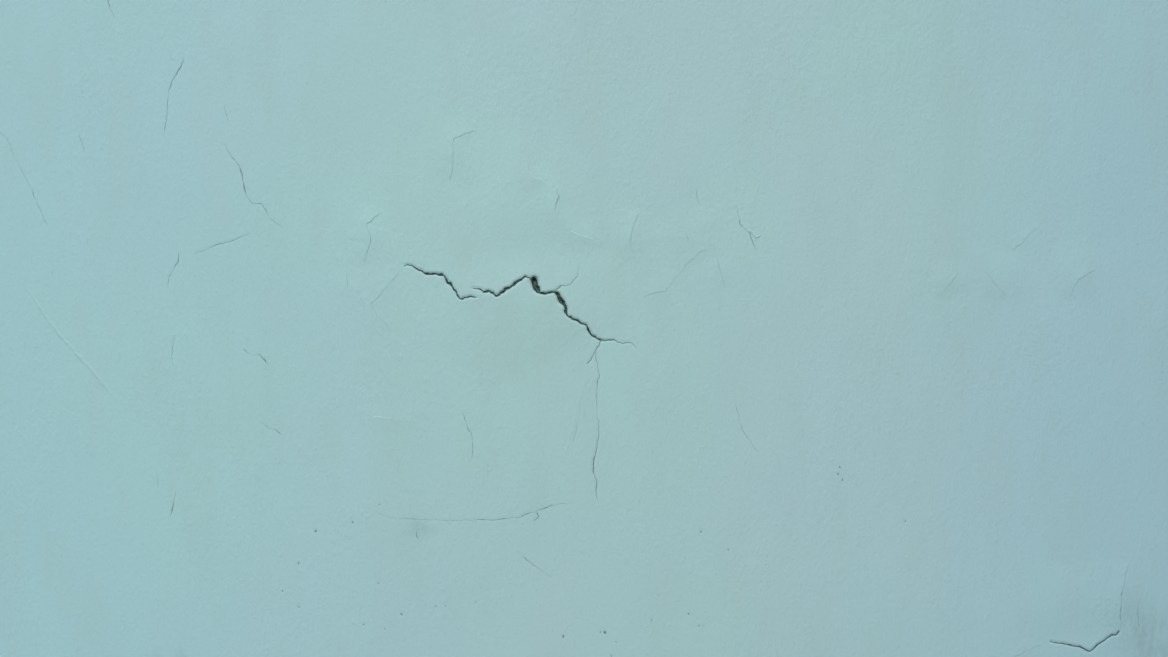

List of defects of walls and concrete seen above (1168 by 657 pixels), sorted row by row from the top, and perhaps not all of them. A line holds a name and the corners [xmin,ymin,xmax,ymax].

crack [405,264,631,500]
crack [1050,616,1139,652]